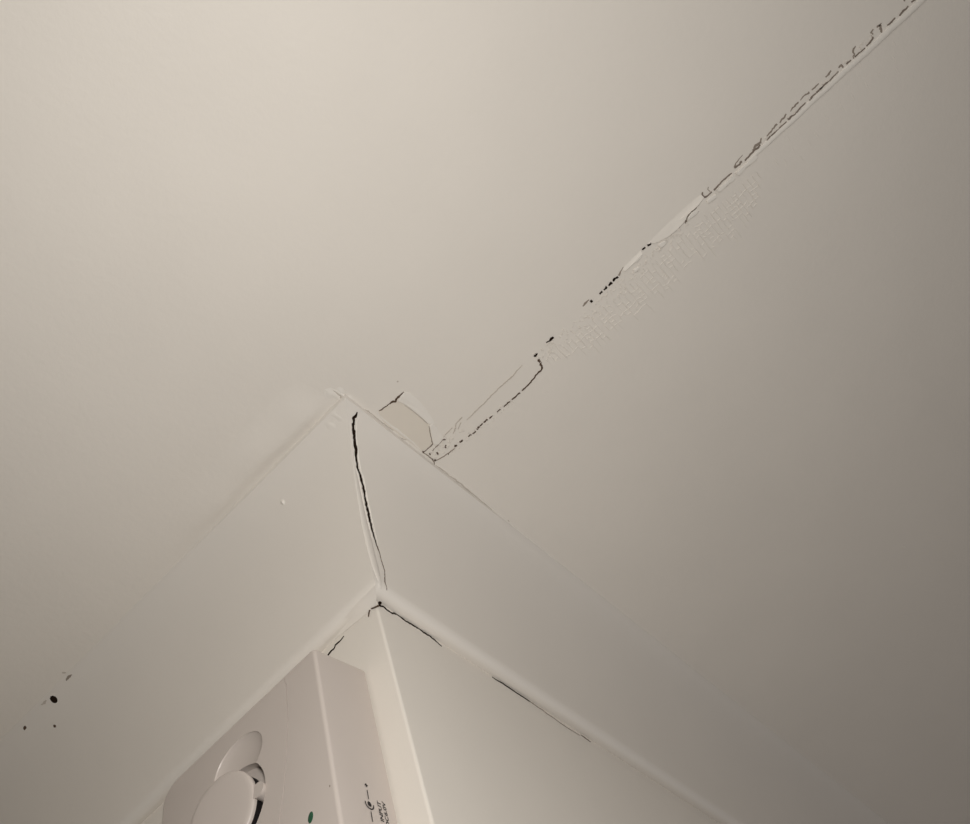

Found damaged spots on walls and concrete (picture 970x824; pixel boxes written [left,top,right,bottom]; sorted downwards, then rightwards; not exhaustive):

crack [352,0,926,647]
peeling [377,392,443,452]
crack [492,677,591,742]